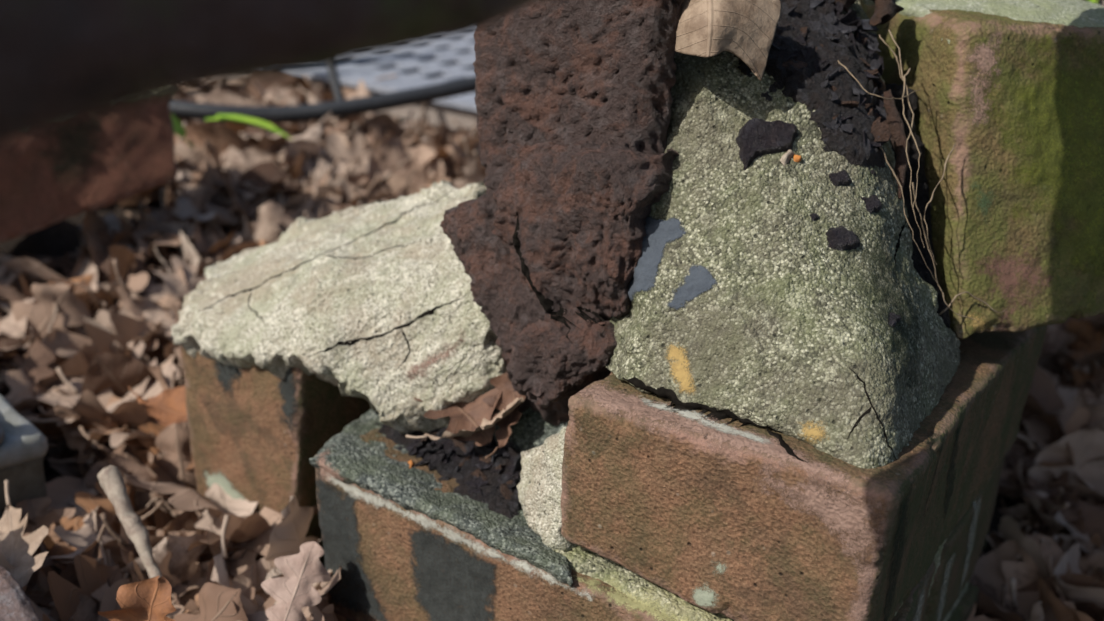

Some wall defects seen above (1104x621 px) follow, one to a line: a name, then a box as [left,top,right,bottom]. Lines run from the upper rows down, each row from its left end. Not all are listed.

crack [307,292,471,371]
crack [847,367,896,459]
damp [315,467,592,621]